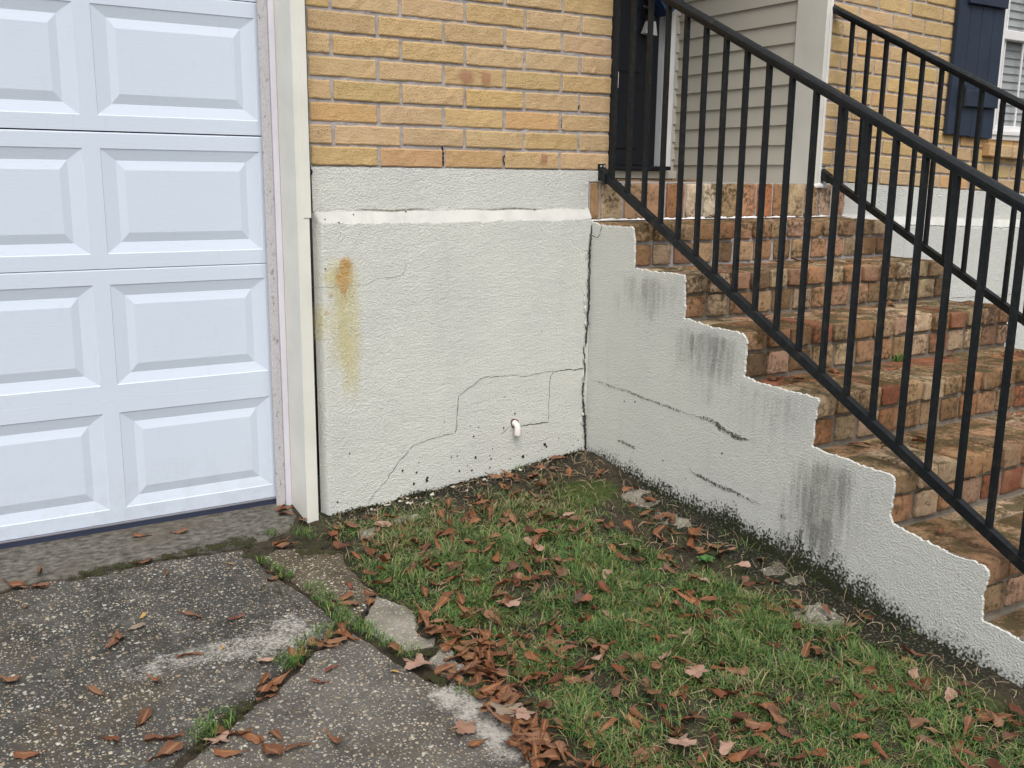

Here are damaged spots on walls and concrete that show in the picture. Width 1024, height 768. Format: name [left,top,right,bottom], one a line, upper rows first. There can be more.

corrosion [337,258,350,286]
crack [369,226,759,504]